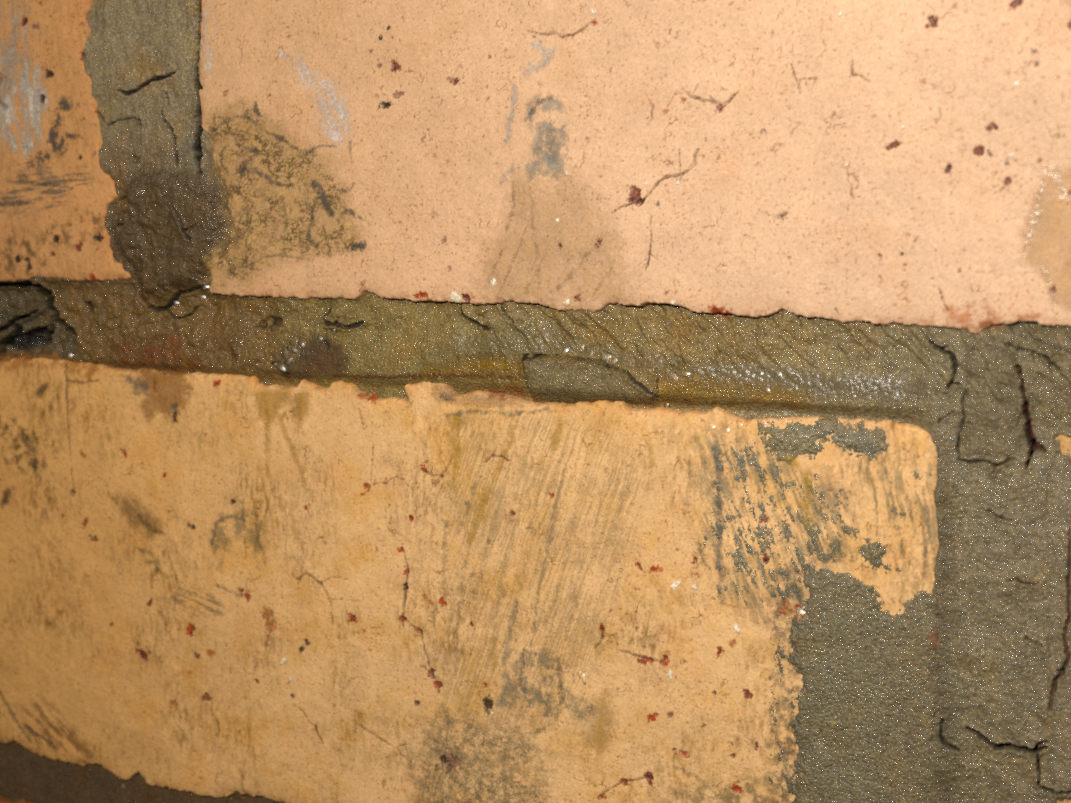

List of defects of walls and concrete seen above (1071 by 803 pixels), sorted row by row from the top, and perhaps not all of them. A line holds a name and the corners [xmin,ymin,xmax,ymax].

crack [97,11,204,170]
water stain [208,105,365,286]
crack [0,280,77,344]
crack [929,334,1061,473]
water stain [709,441,729,571]
water stain [499,654,561,715]
crack [1050,539,1071,708]
crack [940,719,1071,793]